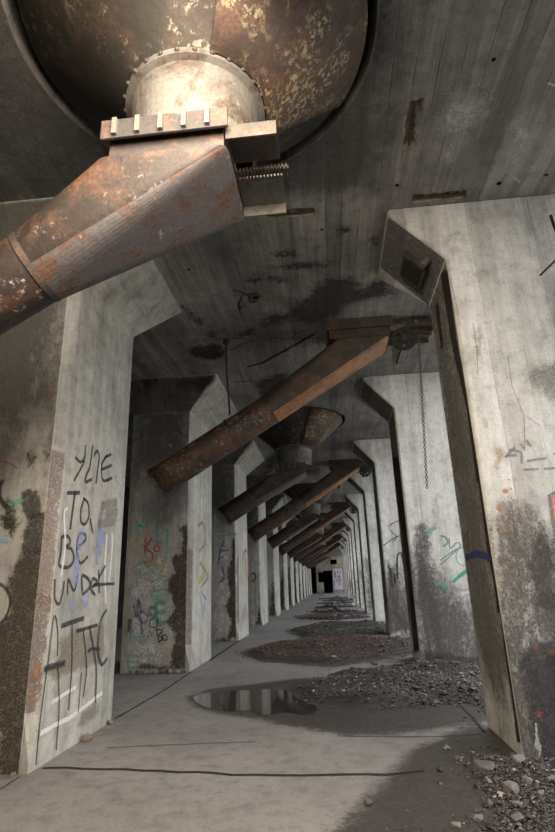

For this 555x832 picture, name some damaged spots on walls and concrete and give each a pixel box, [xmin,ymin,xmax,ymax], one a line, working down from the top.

water stain [21,489,40,520]
water stain [189,270,520,832]
water stain [527,523,555,611]
water stain [519,637,555,758]